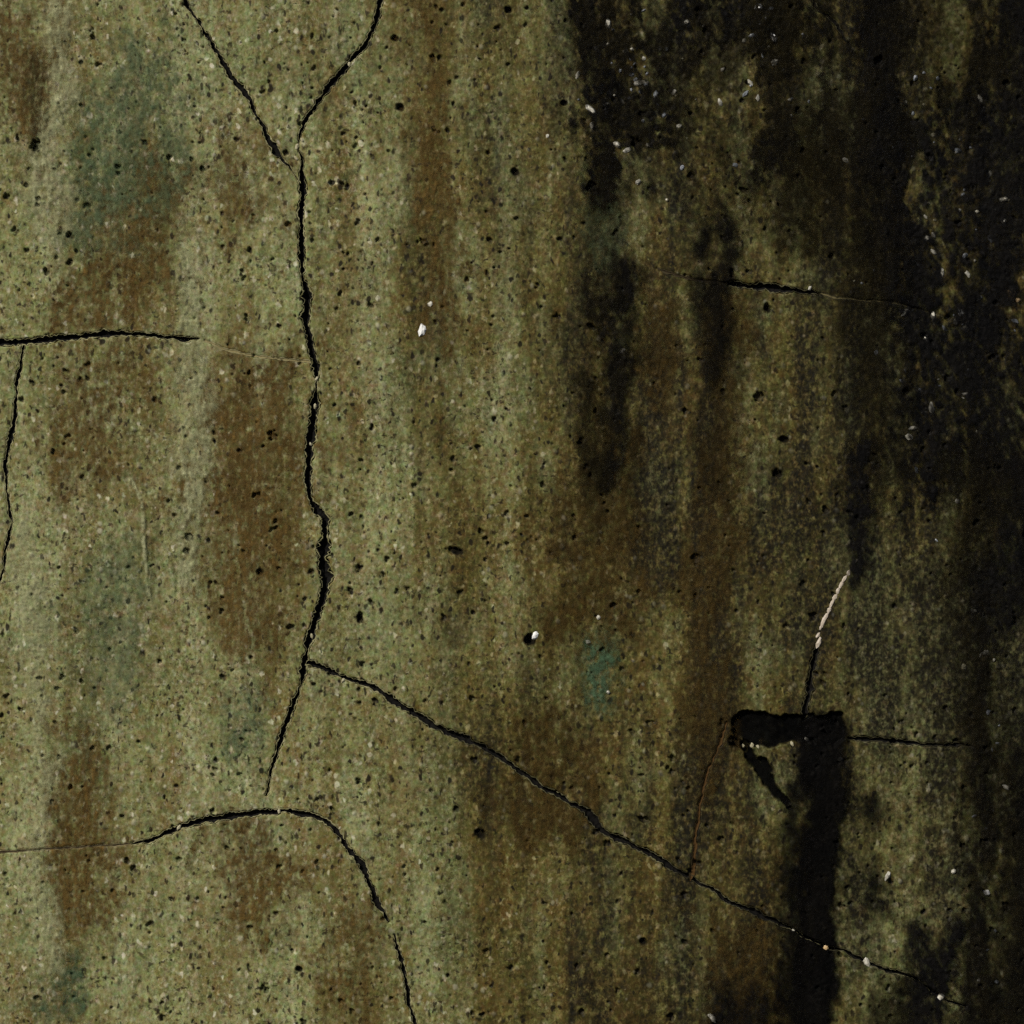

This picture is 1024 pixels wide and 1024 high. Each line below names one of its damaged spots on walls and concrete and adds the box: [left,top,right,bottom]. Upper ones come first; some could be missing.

crack [657,267,906,307]
crack [0,0,795,930]
water stain [567,0,1024,1024]
crack [800,570,850,719]
crack [849,735,968,748]
crack [393,935,418,1024]
crack [797,932,920,981]
crack [929,990,965,1007]